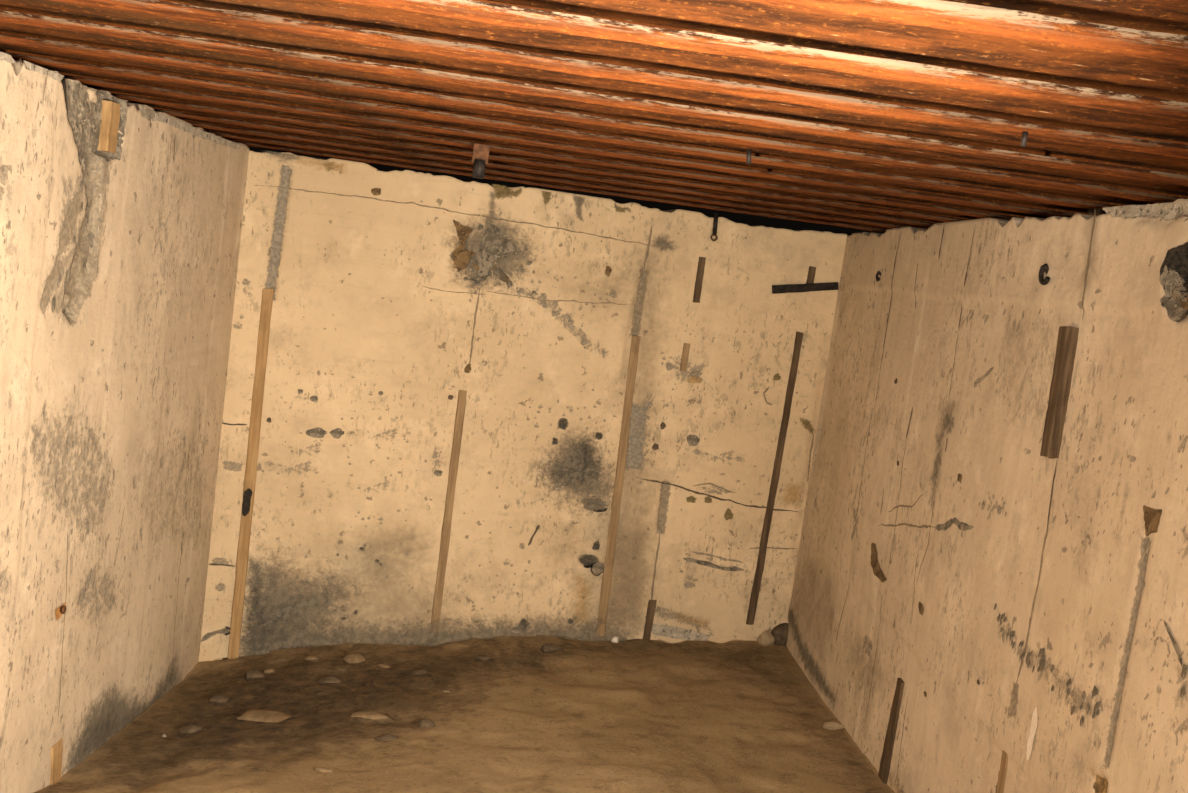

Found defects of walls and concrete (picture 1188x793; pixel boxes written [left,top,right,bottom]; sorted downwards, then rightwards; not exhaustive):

spalling [0,52,242,324]
peeling [224,461,242,471]
mould [520,389,610,510]
water stain [241,563,629,656]